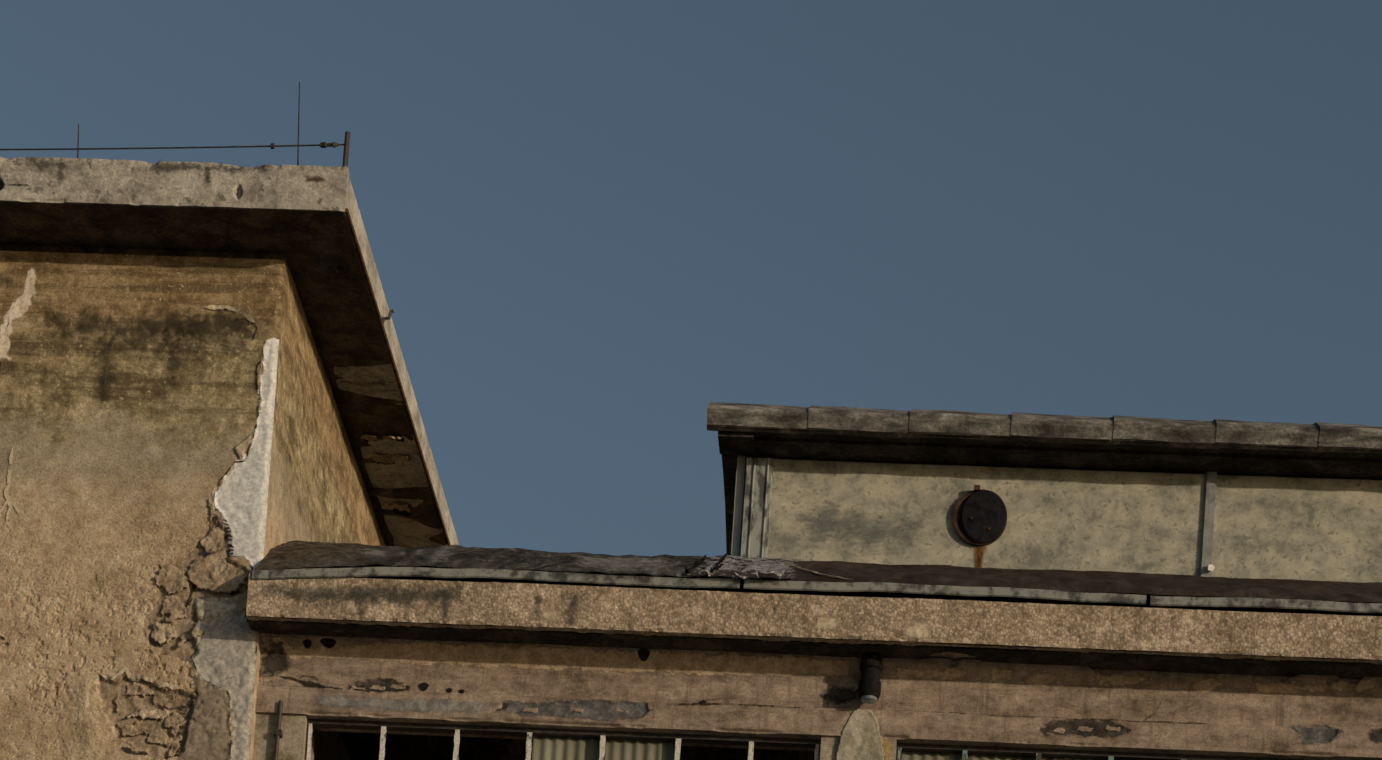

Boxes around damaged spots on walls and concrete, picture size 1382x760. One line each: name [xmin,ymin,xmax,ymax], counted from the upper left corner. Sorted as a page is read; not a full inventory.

crack [0,269,36,361]
leakage [46,311,250,402]
flaking render [205,305,254,332]
peeling [97,338,853,760]
rust [974,546,985,568]
peeling [1040,719,1128,738]